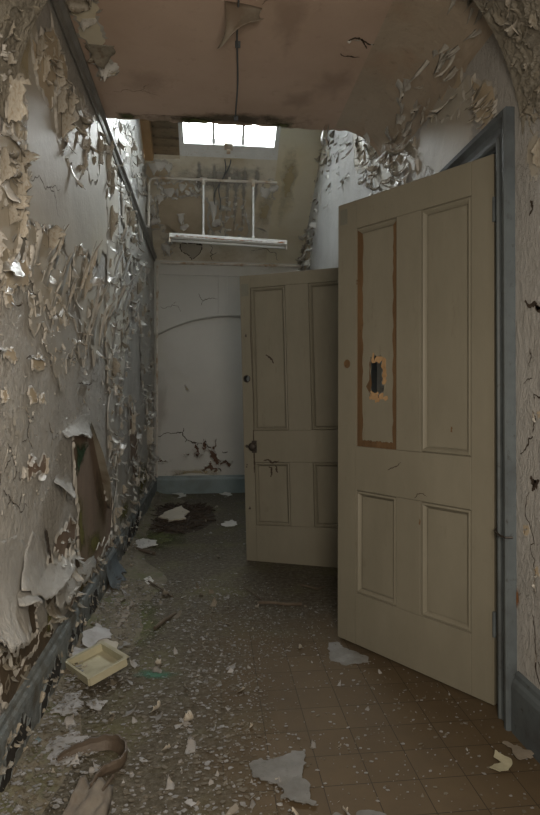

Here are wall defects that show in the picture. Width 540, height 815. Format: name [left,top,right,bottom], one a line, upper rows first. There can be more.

crack [341,37,374,58]
peeling [480,0,538,49]
peeling [295,67,498,271]
crack [524,300,540,313]
peeling [0,0,267,793]
crack [520,352,540,454]
crack [524,476,539,594]